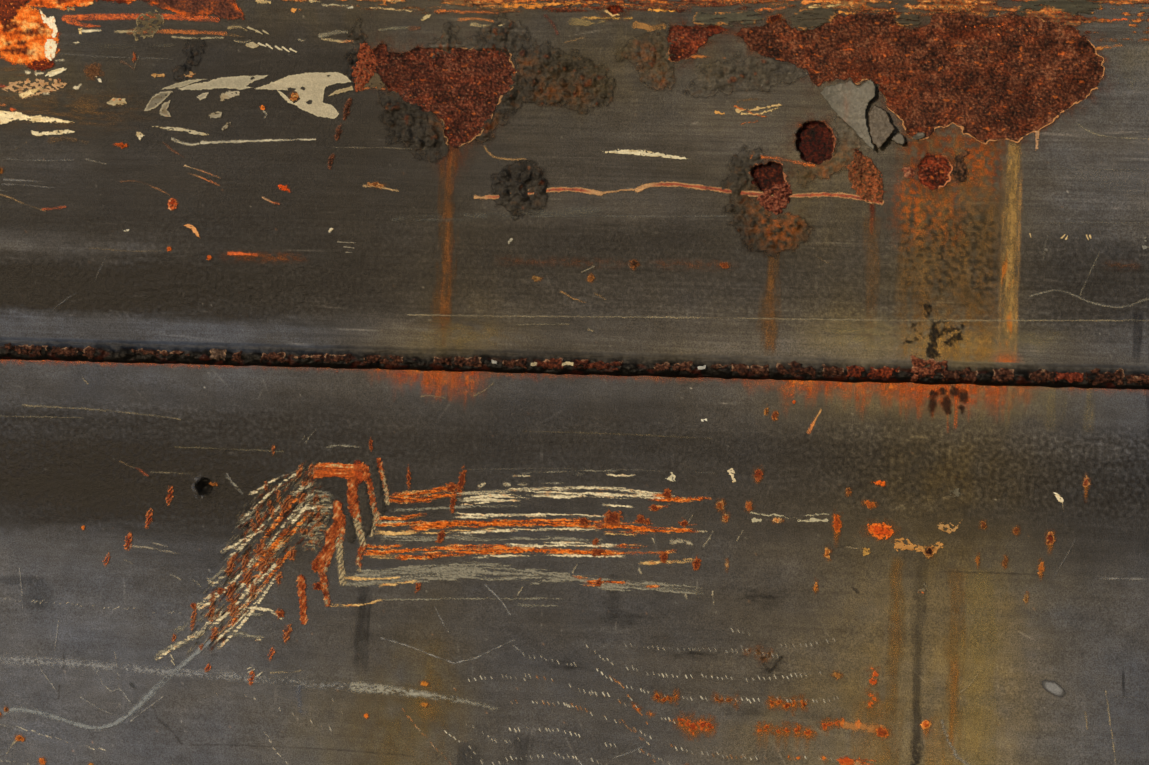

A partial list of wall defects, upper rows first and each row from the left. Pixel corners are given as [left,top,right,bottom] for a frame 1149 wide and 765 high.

corrosion [0,0,245,71]
peeling [0,67,75,136]
peeling [136,91,240,140]
peeling [820,79,925,151]
corrosion [334,0,1149,405]
corrosion [260,352,482,385]
corrosion [366,466,729,560]
corrosion [190,464,320,650]
corrosion [577,576,625,586]
corrosion [677,717,714,737]
corrosion [757,697,889,739]
corrosion [822,756,876,765]